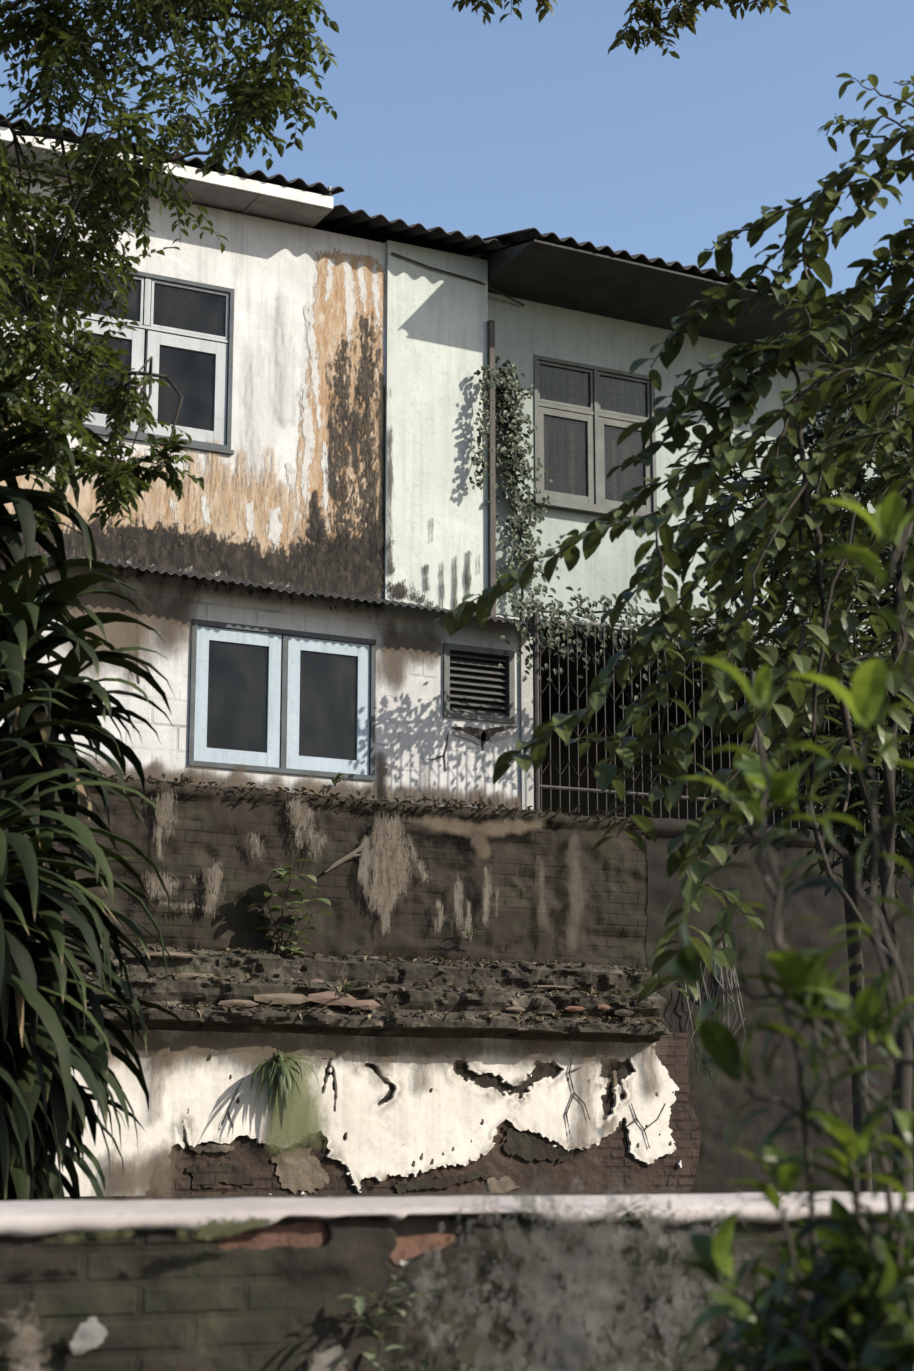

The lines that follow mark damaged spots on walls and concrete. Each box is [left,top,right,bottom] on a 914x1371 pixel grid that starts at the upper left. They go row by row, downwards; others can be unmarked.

leakage [17,299,480,687]
leakage [435,867,499,941]
leakage [569,837,583,947]
spalling [146,1055,701,1267]
crack [565,1053,589,1139]
crack [626,1103,666,1148]
leakage [389,1208,523,1371]
leakage [629,1210,765,1371]